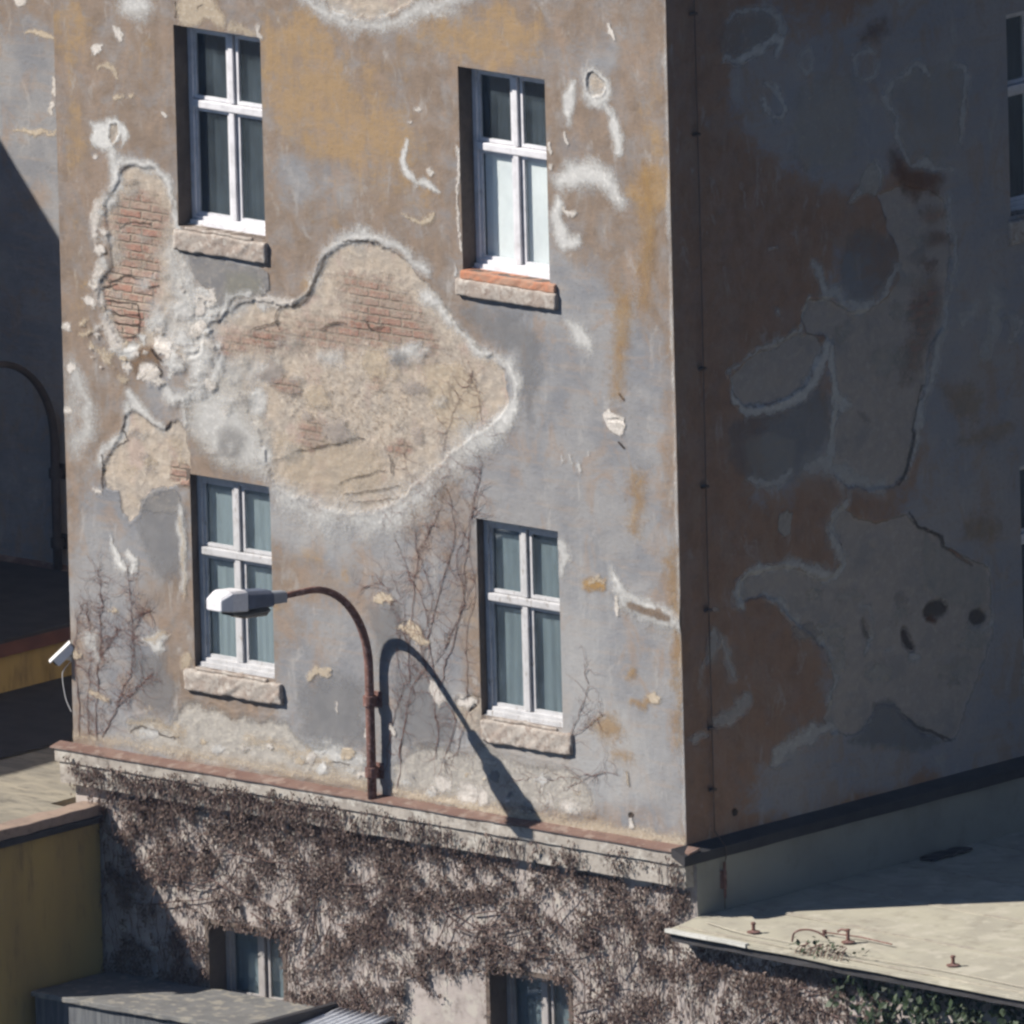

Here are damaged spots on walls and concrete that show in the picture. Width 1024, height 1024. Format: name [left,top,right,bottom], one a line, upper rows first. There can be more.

flaking render [582,67,611,108]
flaking render [79,118,523,590]
flaking render [603,409,625,449]
spalling [373,592,393,604]
flaking render [924,600,948,623]
flaking render [969,610,985,625]
spalling [398,619,430,645]
flaking render [70,633,99,659]
spalling [307,667,331,681]